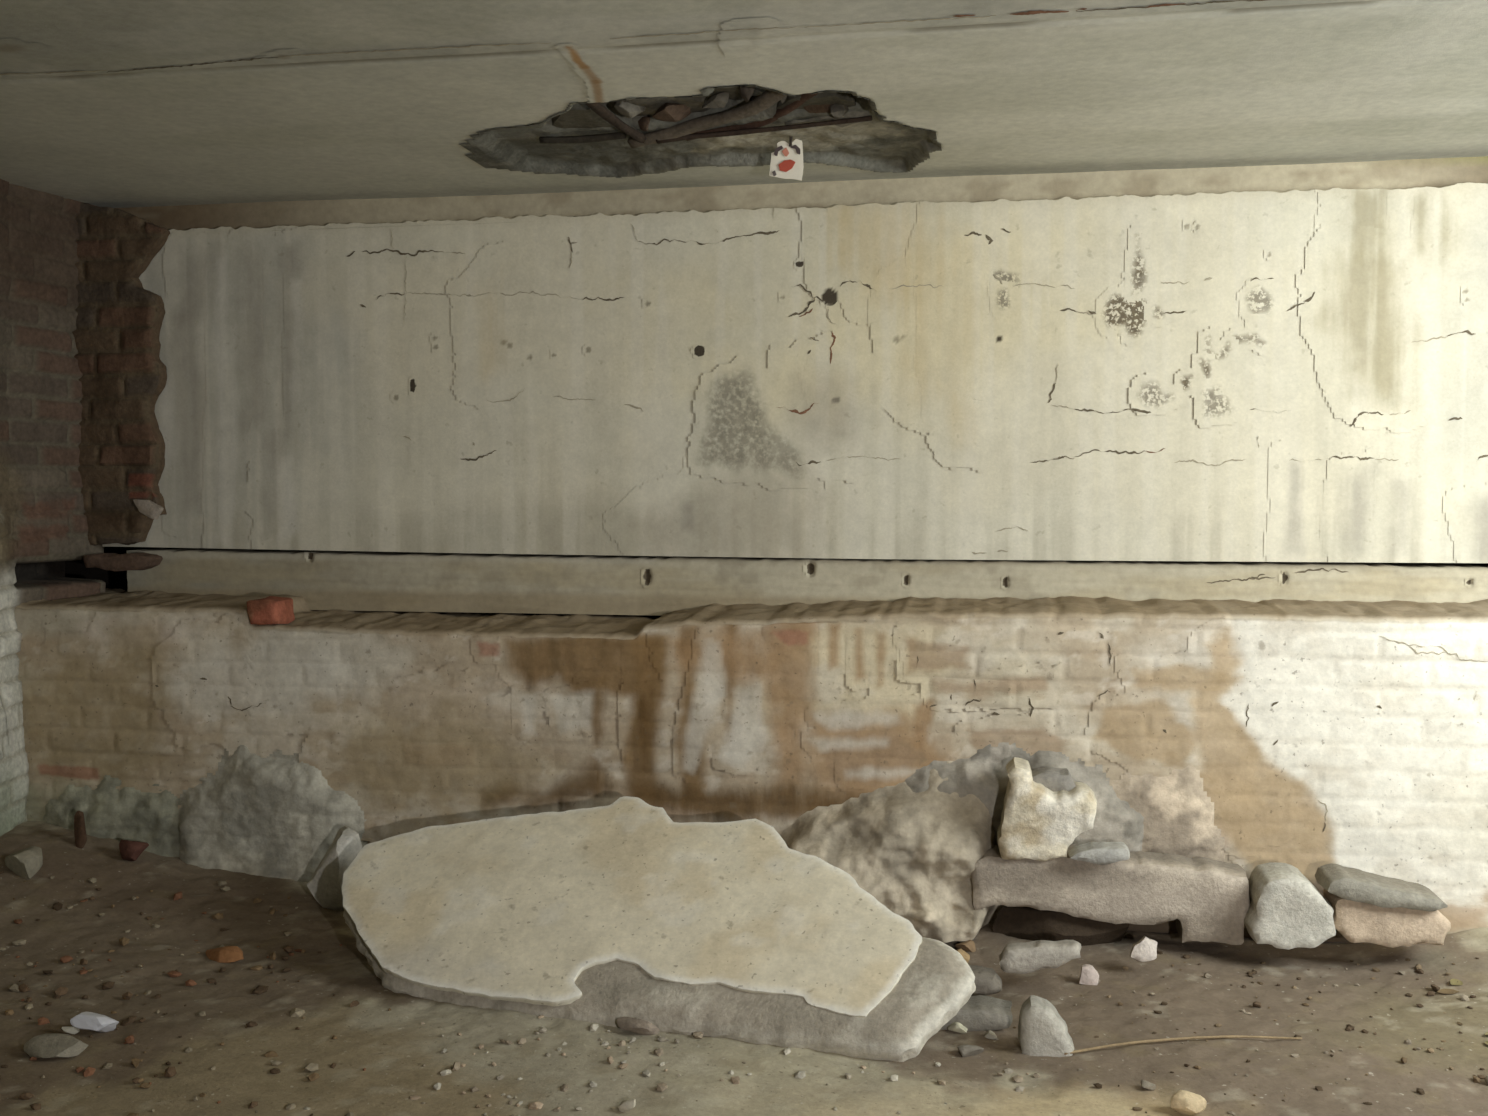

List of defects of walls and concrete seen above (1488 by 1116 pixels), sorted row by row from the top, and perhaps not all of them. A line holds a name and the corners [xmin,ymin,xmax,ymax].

rust [554,43,612,103]
spalling [459,85,942,178]
crack [789,280,947,363]
crack [965,228,1096,315]
damp [1093,225,1173,347]
crack [1251,277,1315,311]
damp [1128,182,1488,433]
damp [603,201,1026,559]
crack [1048,363,1151,414]
crack [1033,408,1410,466]
damp [1264,438,1488,563]
damp [672,628,778,784]